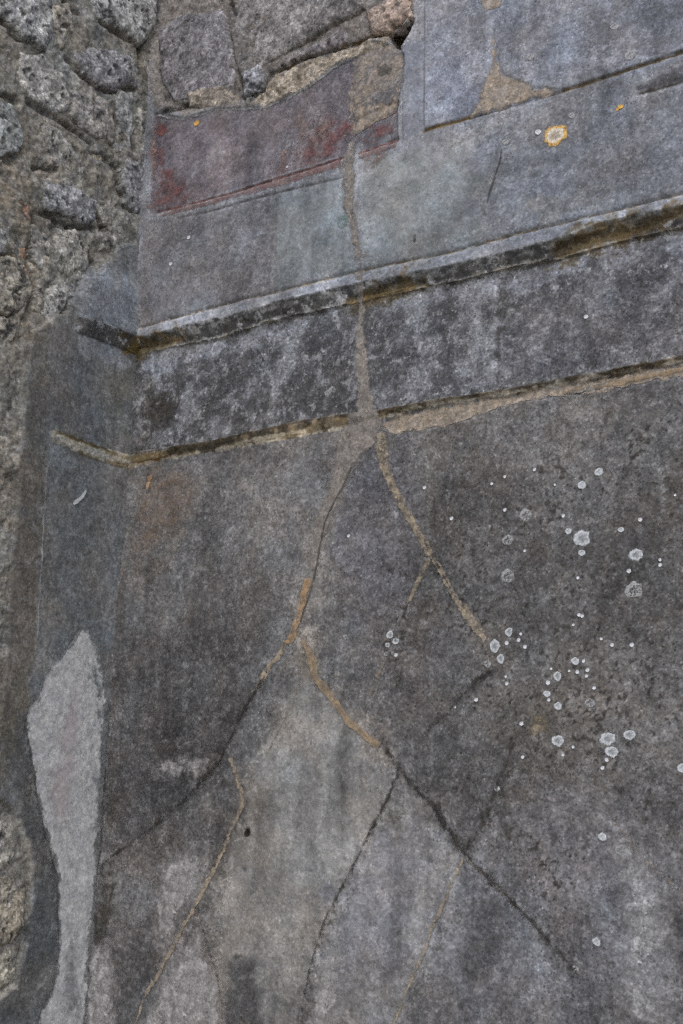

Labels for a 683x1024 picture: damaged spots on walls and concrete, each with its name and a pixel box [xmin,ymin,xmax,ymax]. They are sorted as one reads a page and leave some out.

spalling [150,0,415,216]
crack [96,142,577,1024]